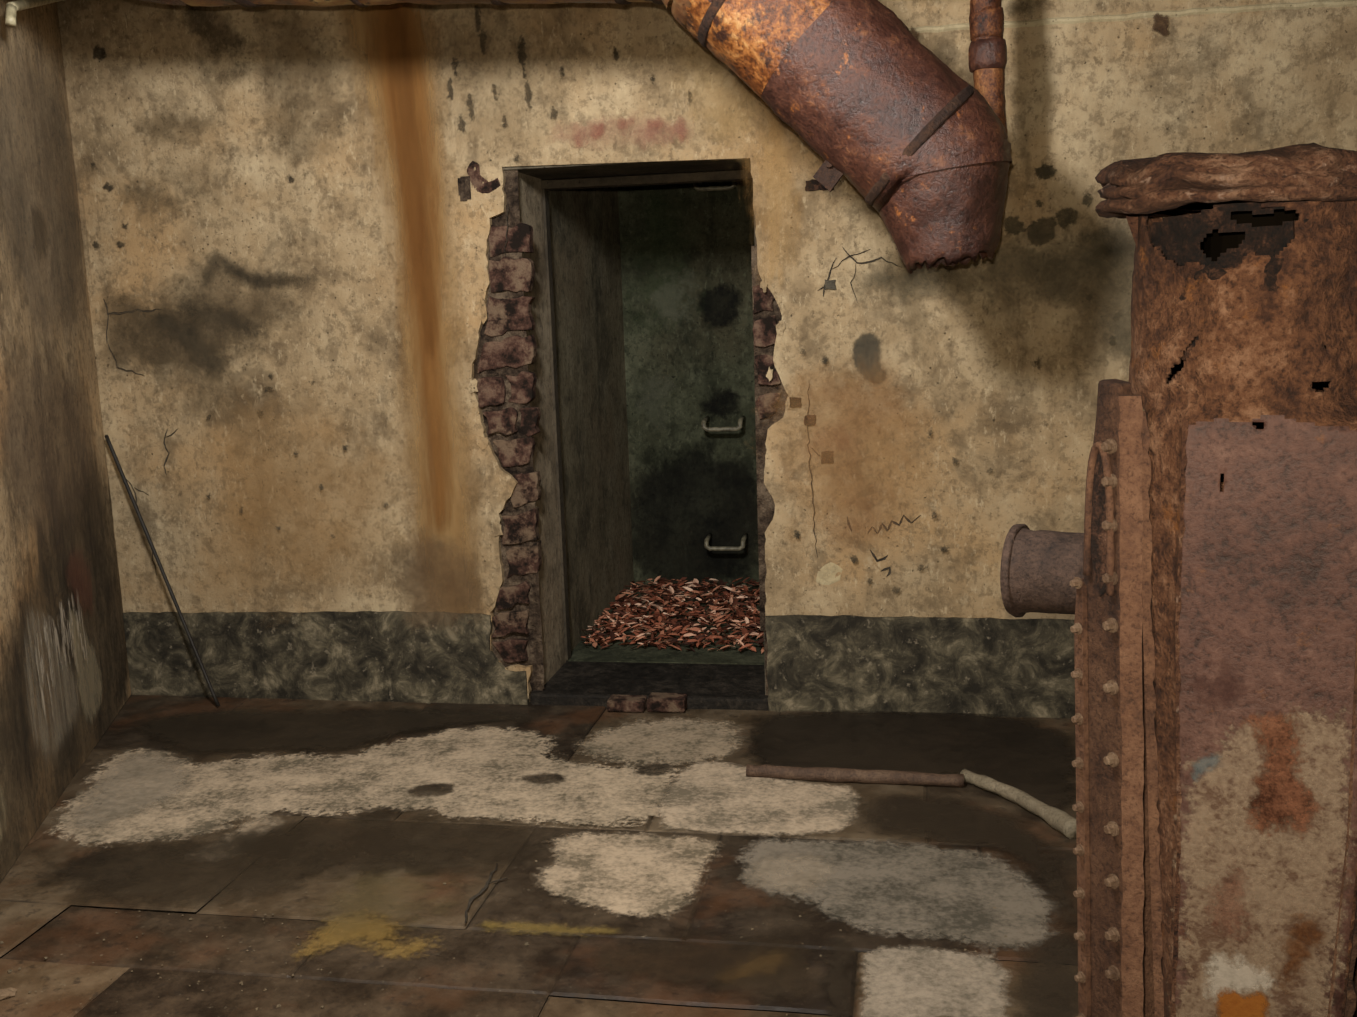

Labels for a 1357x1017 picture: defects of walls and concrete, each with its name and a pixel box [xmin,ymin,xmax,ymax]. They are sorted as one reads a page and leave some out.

water stain [108,256,294,373]
corrosion [347,2,477,613]
spalling [458,161,545,691]
spalling [751,246,793,631]
water stain [140,708,530,754]
water stain [864,794,1078,1017]